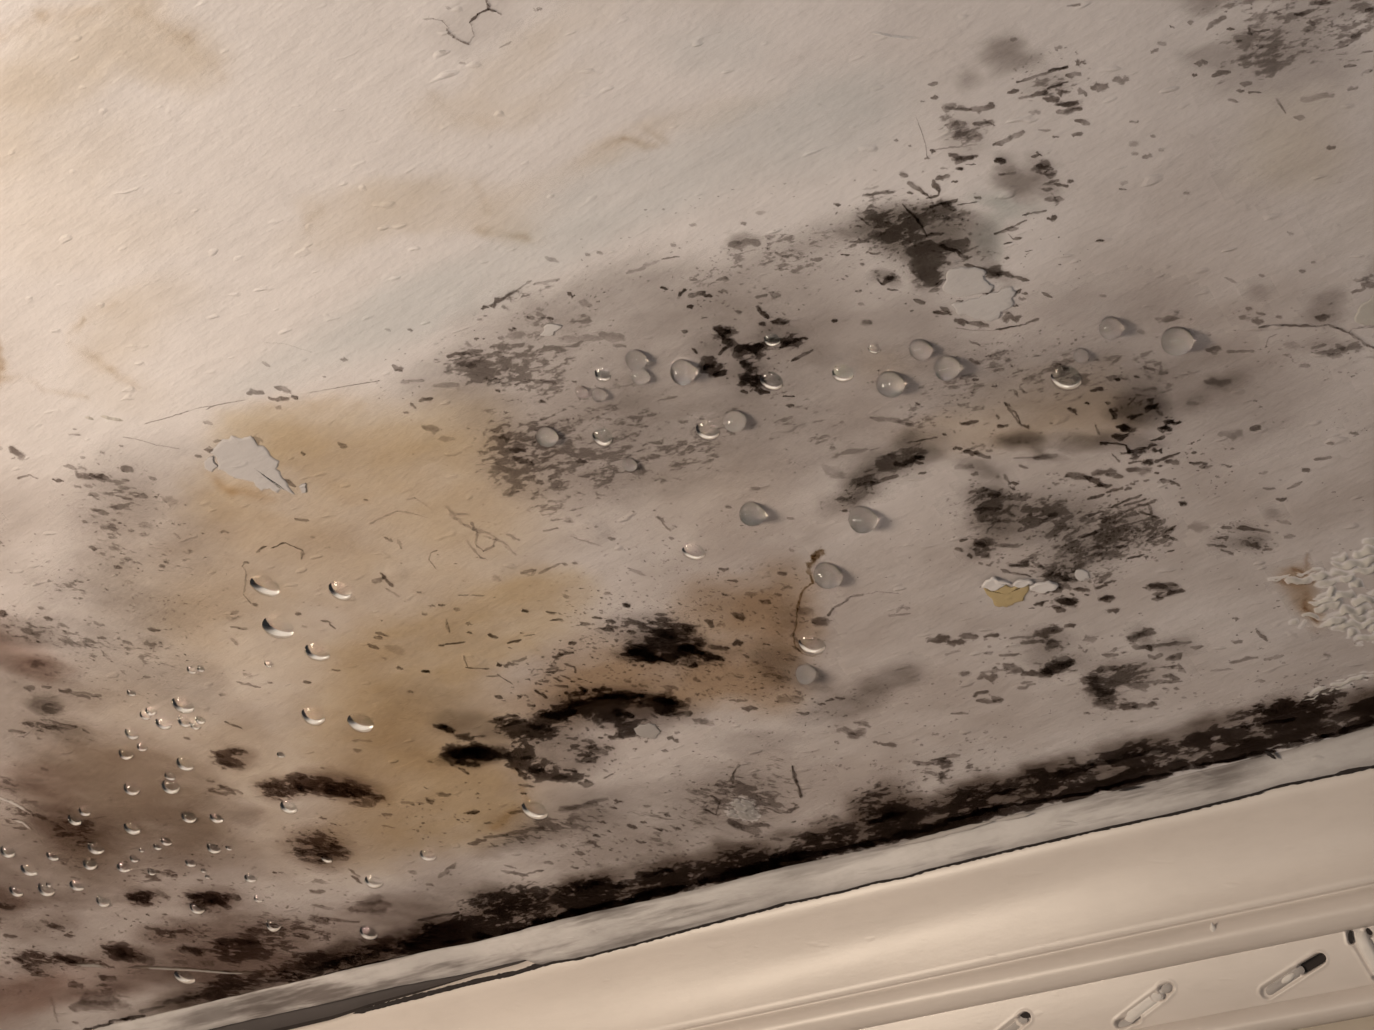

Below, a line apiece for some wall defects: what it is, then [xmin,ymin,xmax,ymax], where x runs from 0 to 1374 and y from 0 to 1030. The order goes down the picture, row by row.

crack [458,0,497,44]
mould [860,149,976,286]
mould [685,307,813,407]
flaking render [204,435,307,495]
mould [1085,399,1200,484]
mould [576,603,743,677]
spalling [981,577,1059,607]
mould [1020,663,1074,677]
mould [1035,572,1119,639]
mould [433,641,693,795]
damp [161,677,1374,999]
mould [19,945,138,981]